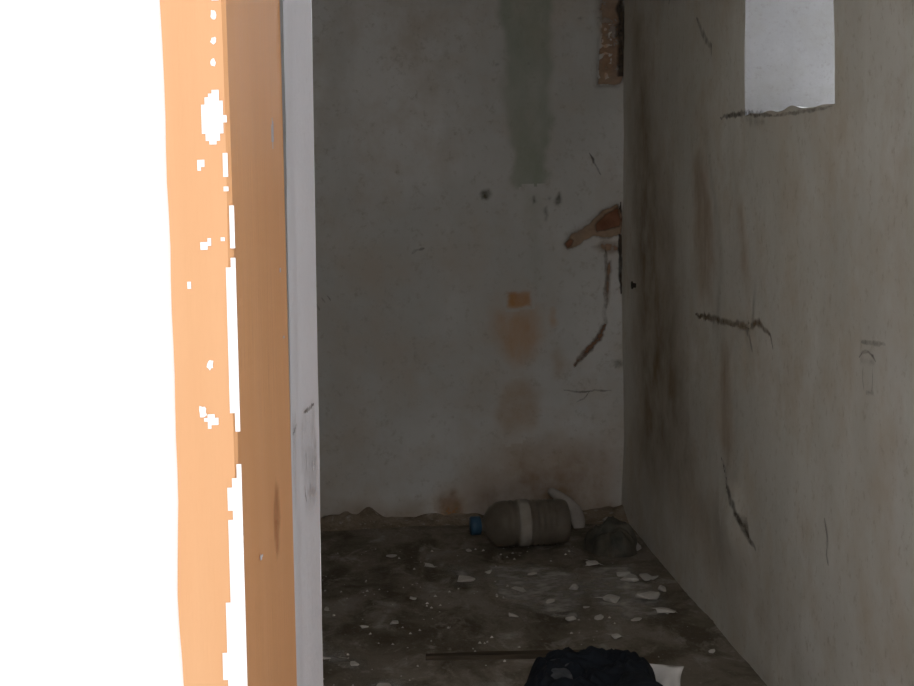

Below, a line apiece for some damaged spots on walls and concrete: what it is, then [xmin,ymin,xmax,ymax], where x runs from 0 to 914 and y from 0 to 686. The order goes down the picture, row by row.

flaking render [596,0,625,87]
flaking render [565,204,622,251]
crack [605,202,622,294]
damp [320,0,831,686]
crack [574,324,606,366]
crack [696,313,773,347]
crack [721,457,752,544]